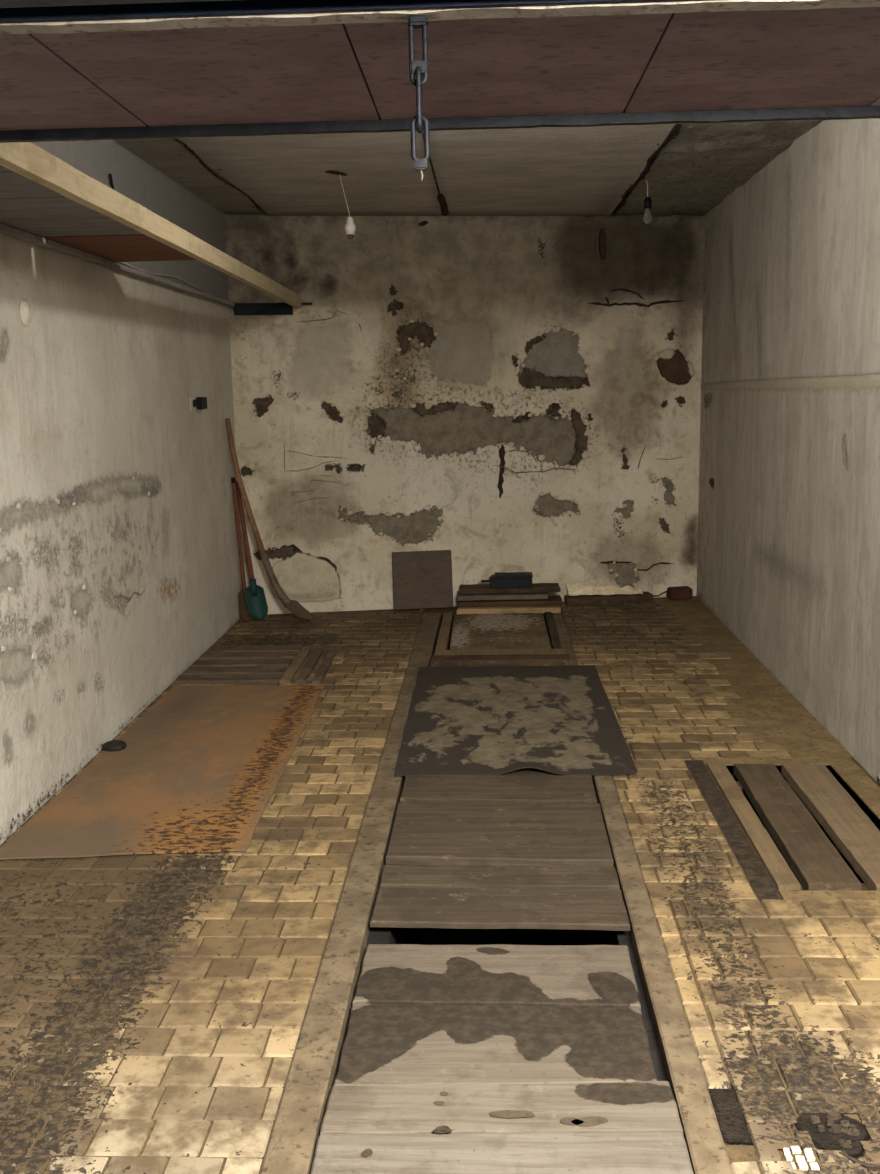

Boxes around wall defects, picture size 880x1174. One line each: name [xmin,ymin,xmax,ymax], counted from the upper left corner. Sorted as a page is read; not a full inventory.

crack [589,288,686,307]
spalling [252,370,298,417]
spalling [321,283,593,479]
spalling [654,330,694,408]
crack [493,444,576,498]
spalling [338,505,444,547]
spalling [533,491,580,518]